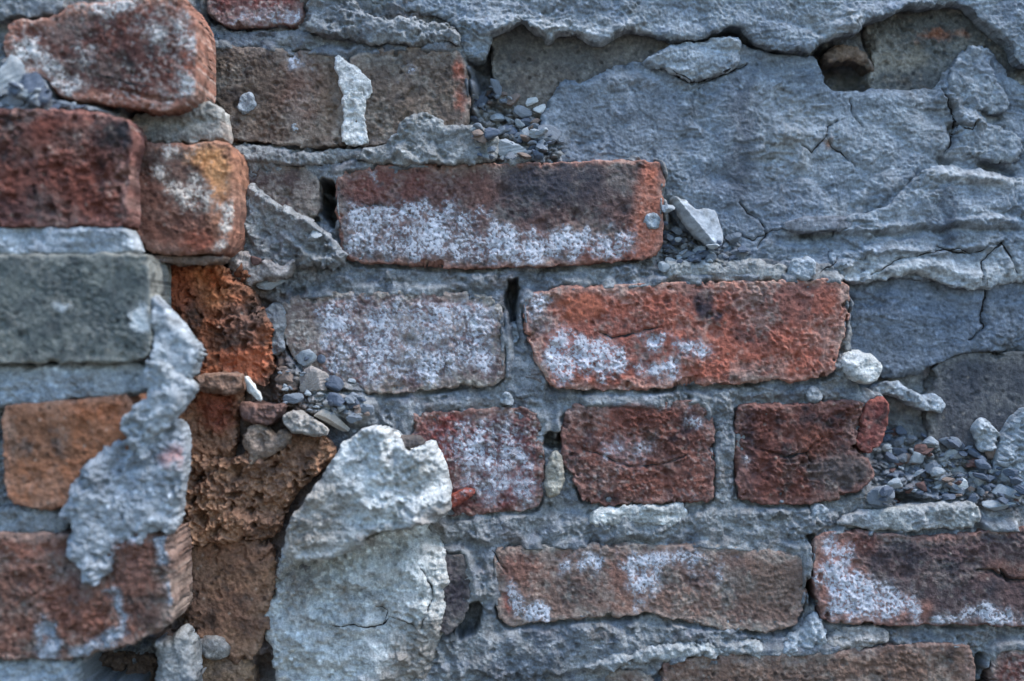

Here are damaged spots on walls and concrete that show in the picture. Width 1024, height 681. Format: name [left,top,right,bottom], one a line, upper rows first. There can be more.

crack [801,100,857,166]
crack [944,94,977,152]
efflorescence [346,200,632,264]
crack [739,202,781,248]
crack [871,242,1017,340]
efflorescence [315,302,495,383]
efflorescence [545,331,708,383]
efflorescence [455,420,536,505]
damp [740,536,921,620]
efflorescence [931,603,1012,624]